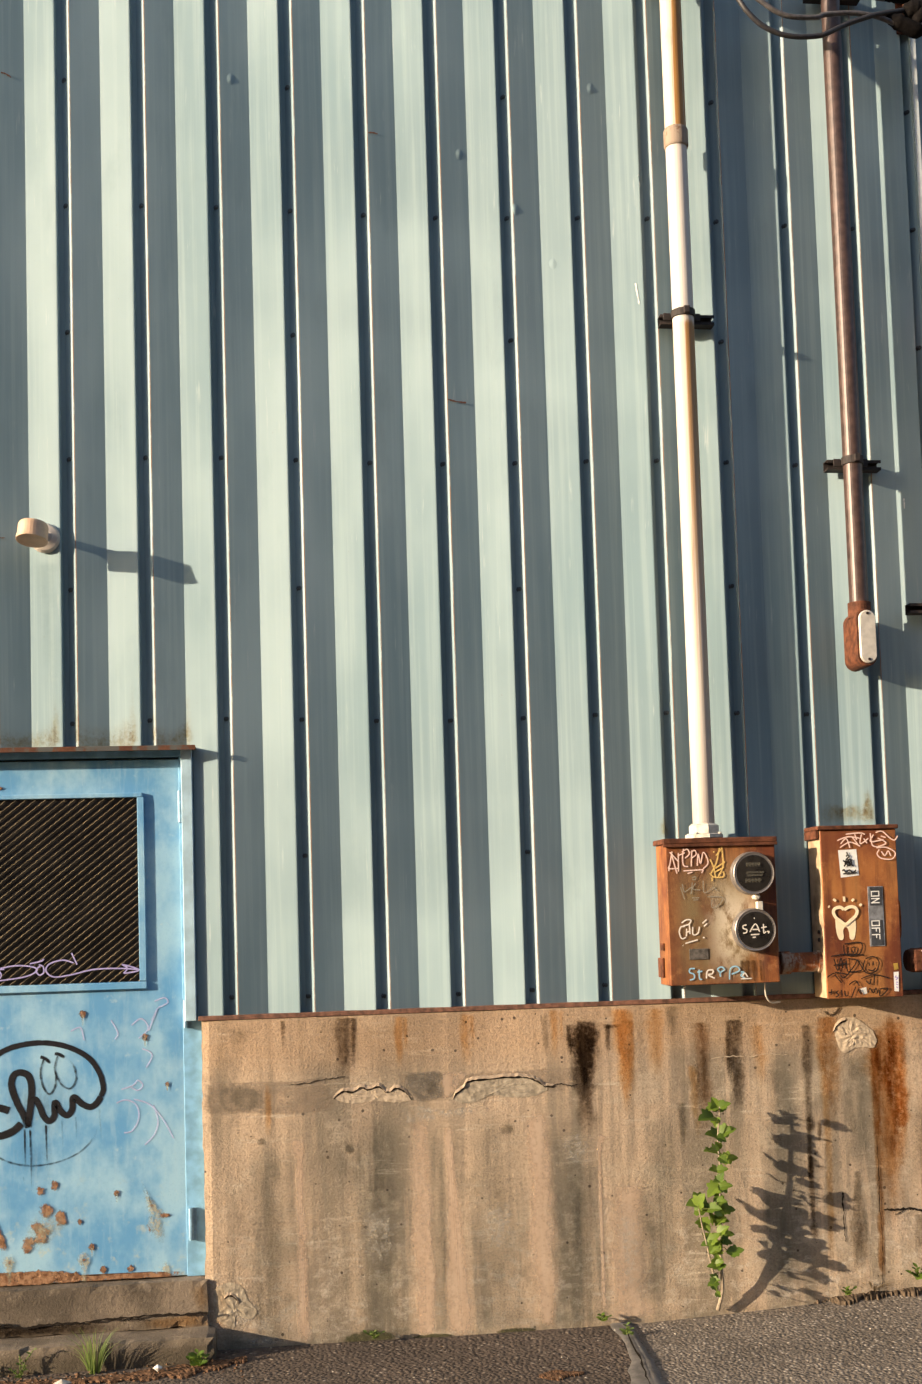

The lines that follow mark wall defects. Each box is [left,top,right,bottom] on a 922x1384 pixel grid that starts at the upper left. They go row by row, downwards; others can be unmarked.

spalling [333,1083,412,1104]
spalling [453,1073,555,1104]
damp [567,1024,609,1114]
damp [726,1021,742,1085]
corrosion [0,1181,179,1286]
crack [877,1147,922,1286]